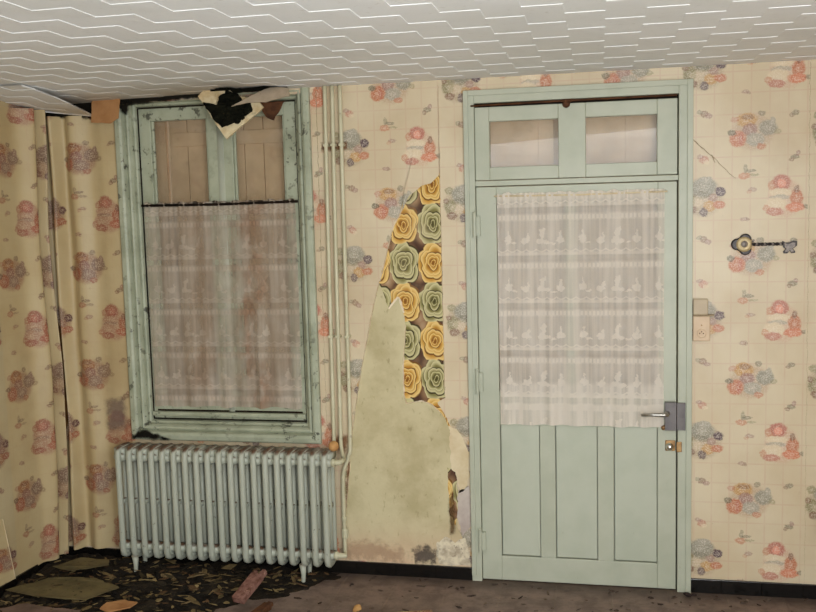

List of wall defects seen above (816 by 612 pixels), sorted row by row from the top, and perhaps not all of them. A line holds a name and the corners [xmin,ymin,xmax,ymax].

flaking render [343,284,471,567]